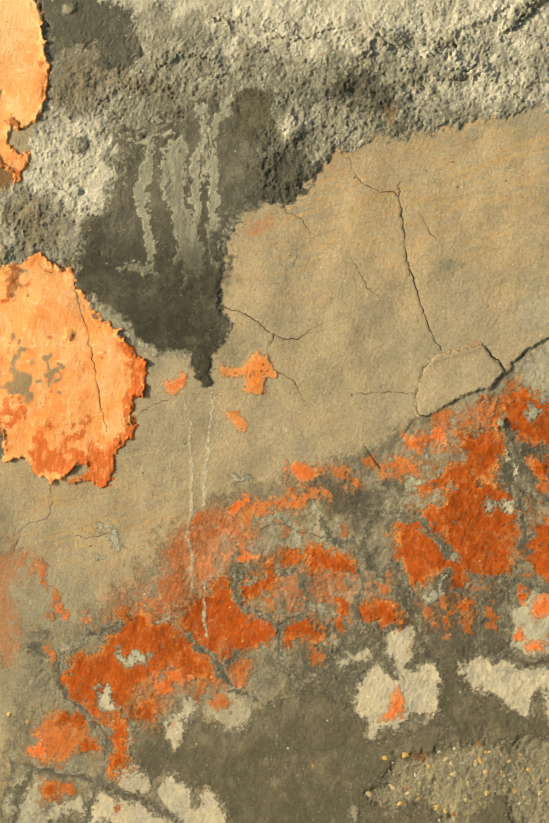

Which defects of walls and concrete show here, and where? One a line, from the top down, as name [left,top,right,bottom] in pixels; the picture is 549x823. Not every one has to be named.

crack [74,282,108,449]
leakage [63,88,315,637]
spalling [0,0,549,488]
crack [225,307,325,346]
crack [349,158,546,442]
spalling [0,337,549,823]
leakage [130,570,549,823]